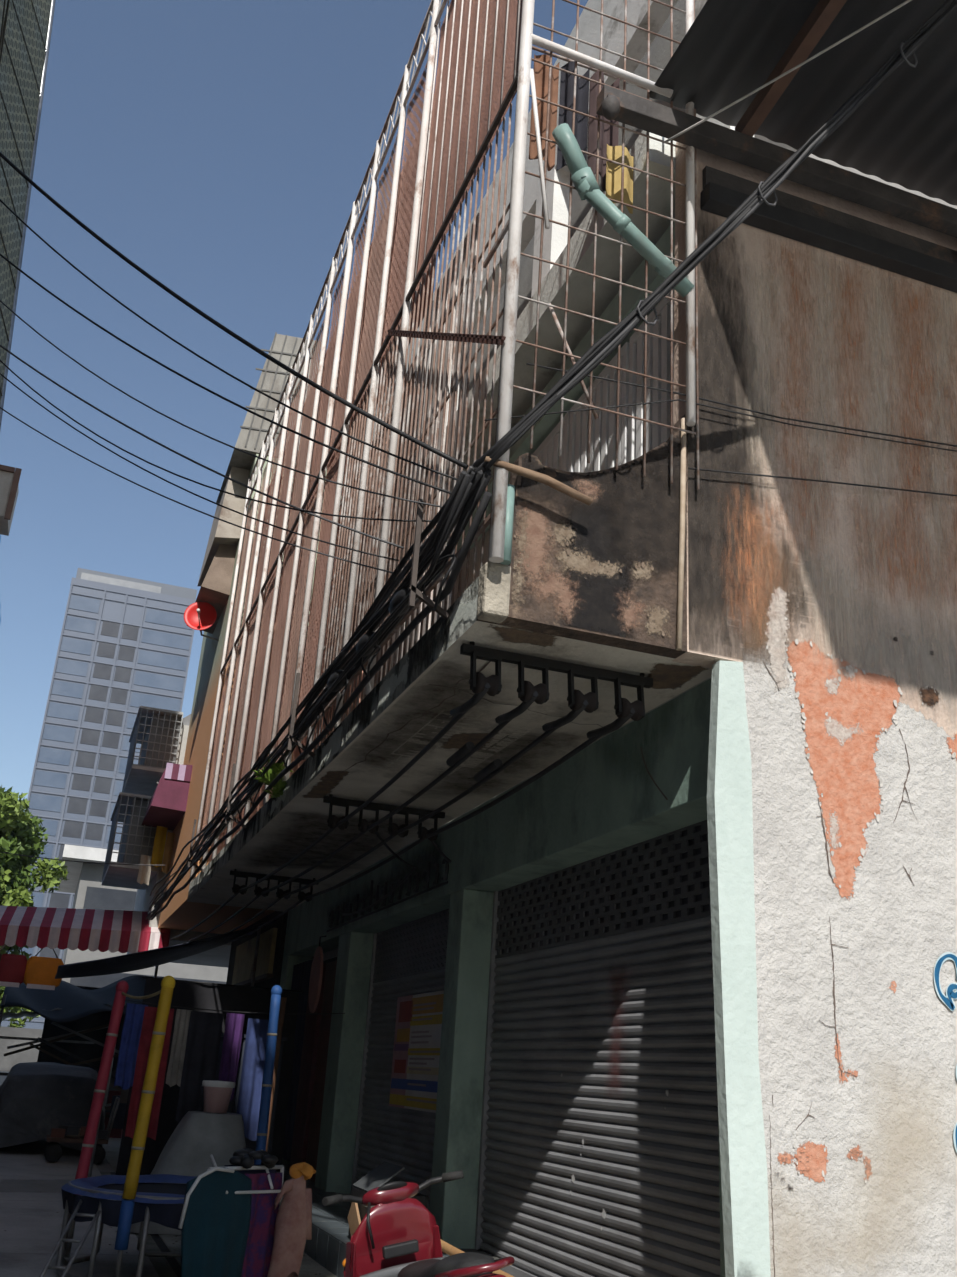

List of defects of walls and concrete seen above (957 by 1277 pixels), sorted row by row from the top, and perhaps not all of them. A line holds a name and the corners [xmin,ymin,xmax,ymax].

damp [517,213,957,708]
spalling [920,686,939,707]
damp [441,734,574,794]
peeling [784,639,903,901]
crack [893,729,915,823]
peeling [946,733,957,761]
crack [819,918,856,1077]
peeling [778,1141,829,1183]
peeling [847,1145,872,1183]